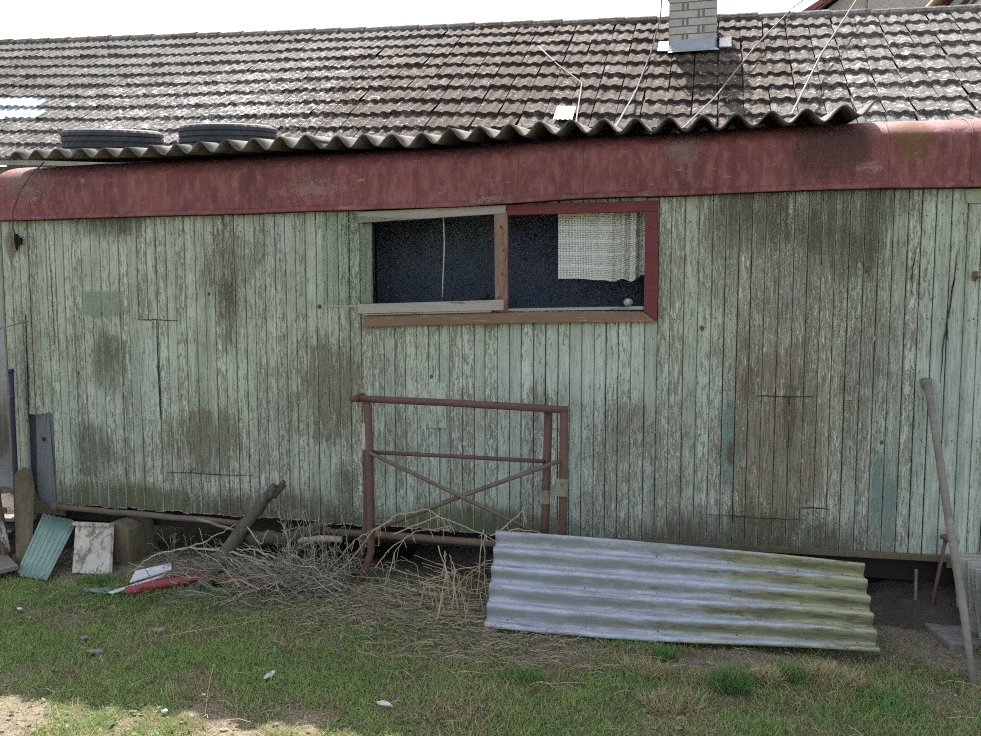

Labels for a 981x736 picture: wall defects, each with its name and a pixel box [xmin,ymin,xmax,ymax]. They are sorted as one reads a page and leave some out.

peeling [166,408,248,481]
peeling [294,334,364,455]
peeling [497,226,505,299]
peeling [715,220,862,539]
peeling [840,317,907,417]
crack [940,255,957,384]